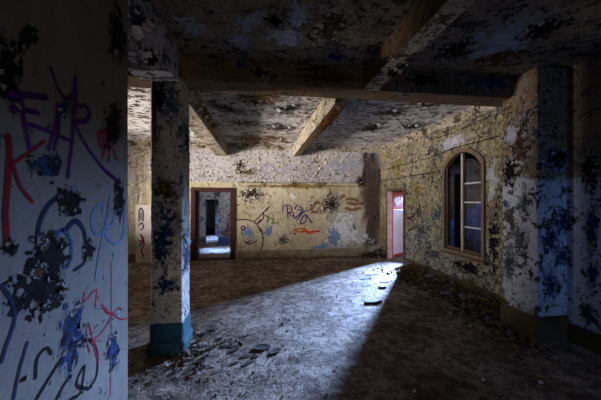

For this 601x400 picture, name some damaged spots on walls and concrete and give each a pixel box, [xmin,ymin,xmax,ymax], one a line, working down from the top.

peeling [0,19,45,121]
peeling [99,0,181,83]
peeling [229,0,360,52]
peeling [101,81,191,320]
flaking render [189,91,569,309]
peeling [579,146,601,288]
peeling [0,226,121,399]